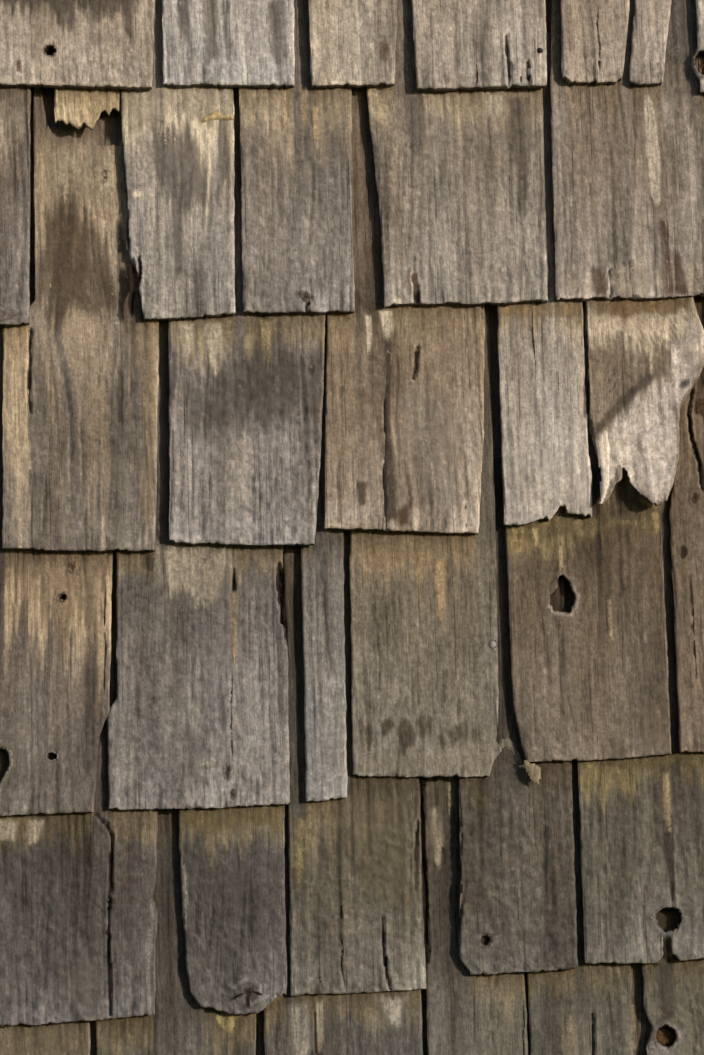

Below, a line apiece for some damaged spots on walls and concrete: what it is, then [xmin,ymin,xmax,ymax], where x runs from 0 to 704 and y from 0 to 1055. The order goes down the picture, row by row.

water stain [39,200,147,332]